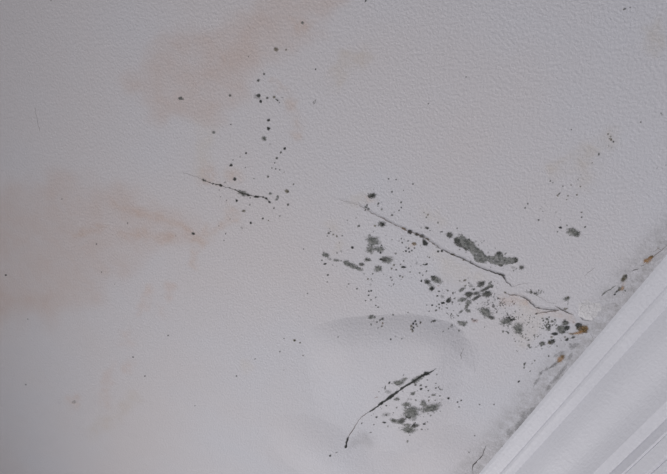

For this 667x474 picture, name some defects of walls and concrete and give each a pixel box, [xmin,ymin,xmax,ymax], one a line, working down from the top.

crack [202,179,270,203]
damp [321,234,406,280]
crack [326,196,573,325]
damp [440,228,524,271]
damp [419,257,493,332]
damp [500,311,575,348]
crack [329,369,435,457]
damp [373,383,440,443]